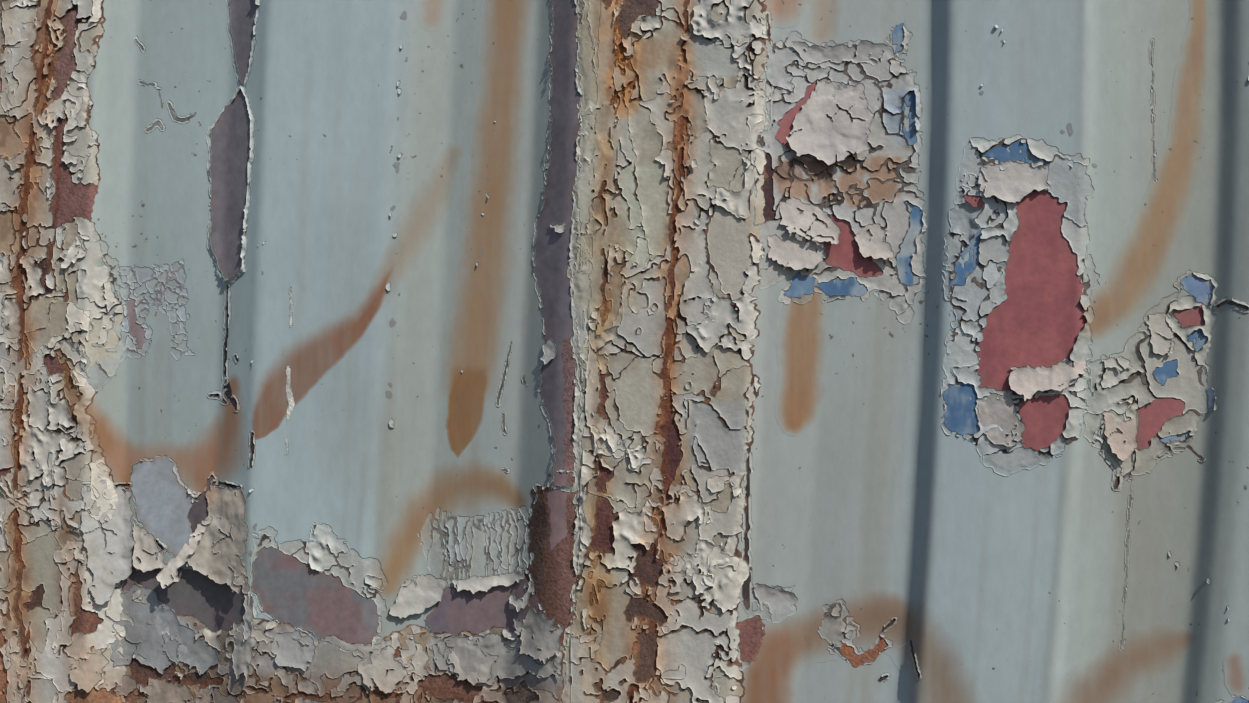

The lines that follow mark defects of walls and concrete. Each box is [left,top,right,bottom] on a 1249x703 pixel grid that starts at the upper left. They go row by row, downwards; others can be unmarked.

peeling [0,0,928,703]
peeling [941,123,1219,482]